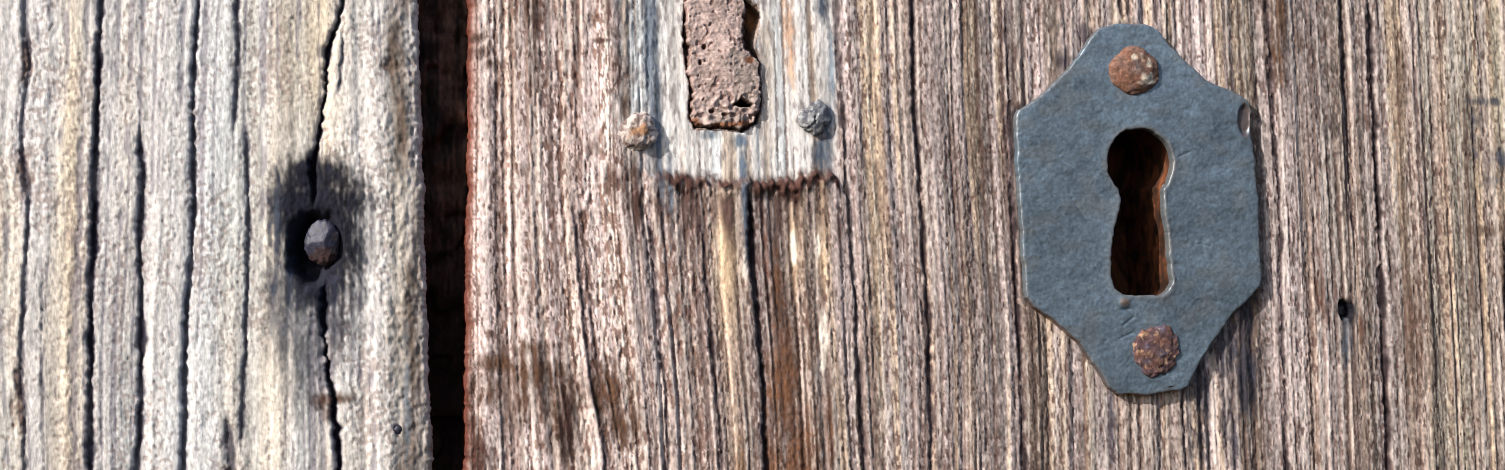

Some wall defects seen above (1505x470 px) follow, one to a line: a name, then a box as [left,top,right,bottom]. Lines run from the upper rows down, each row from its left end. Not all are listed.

crack [311,30,336,199]
damp [266,150,375,421]
crack [321,286,342,470]